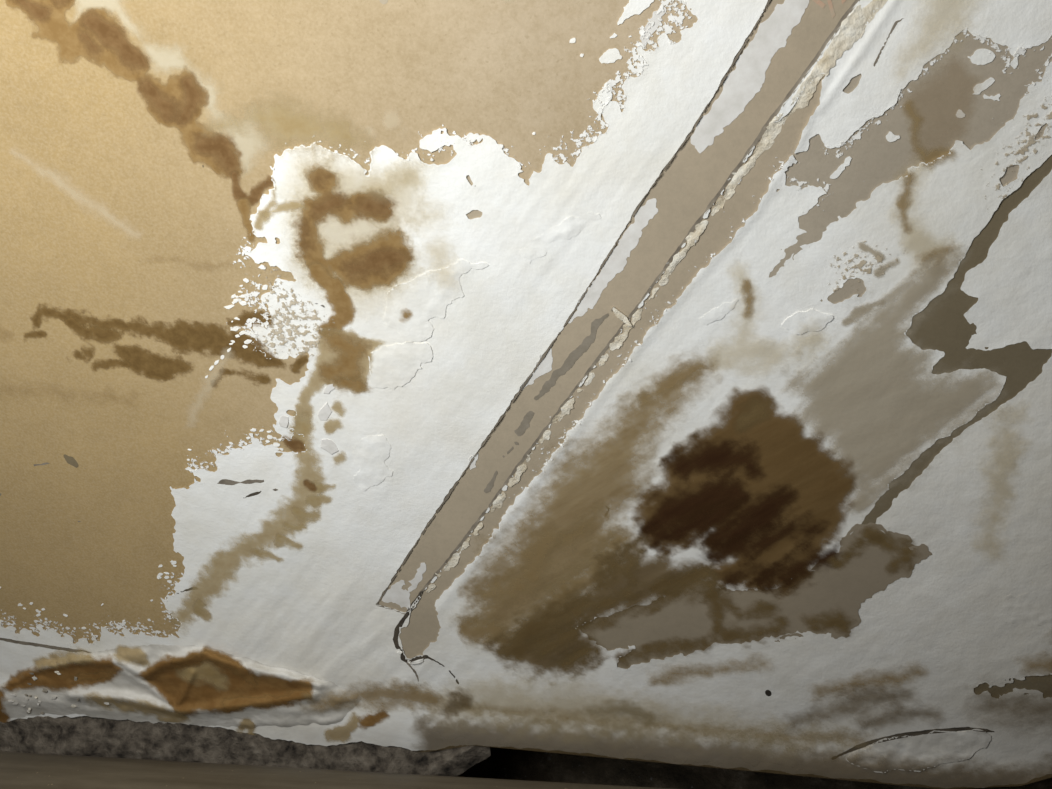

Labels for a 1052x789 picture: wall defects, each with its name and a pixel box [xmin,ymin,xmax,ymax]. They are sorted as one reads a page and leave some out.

water stain [6,0,412,624]
peeling [0,0,698,644]
crack [376,0,860,686]
water stain [460,363,914,674]
water stain [653,667,729,684]
peeling [378,0,1052,671]
crack [874,18,904,66]
peeling [974,675,1052,699]